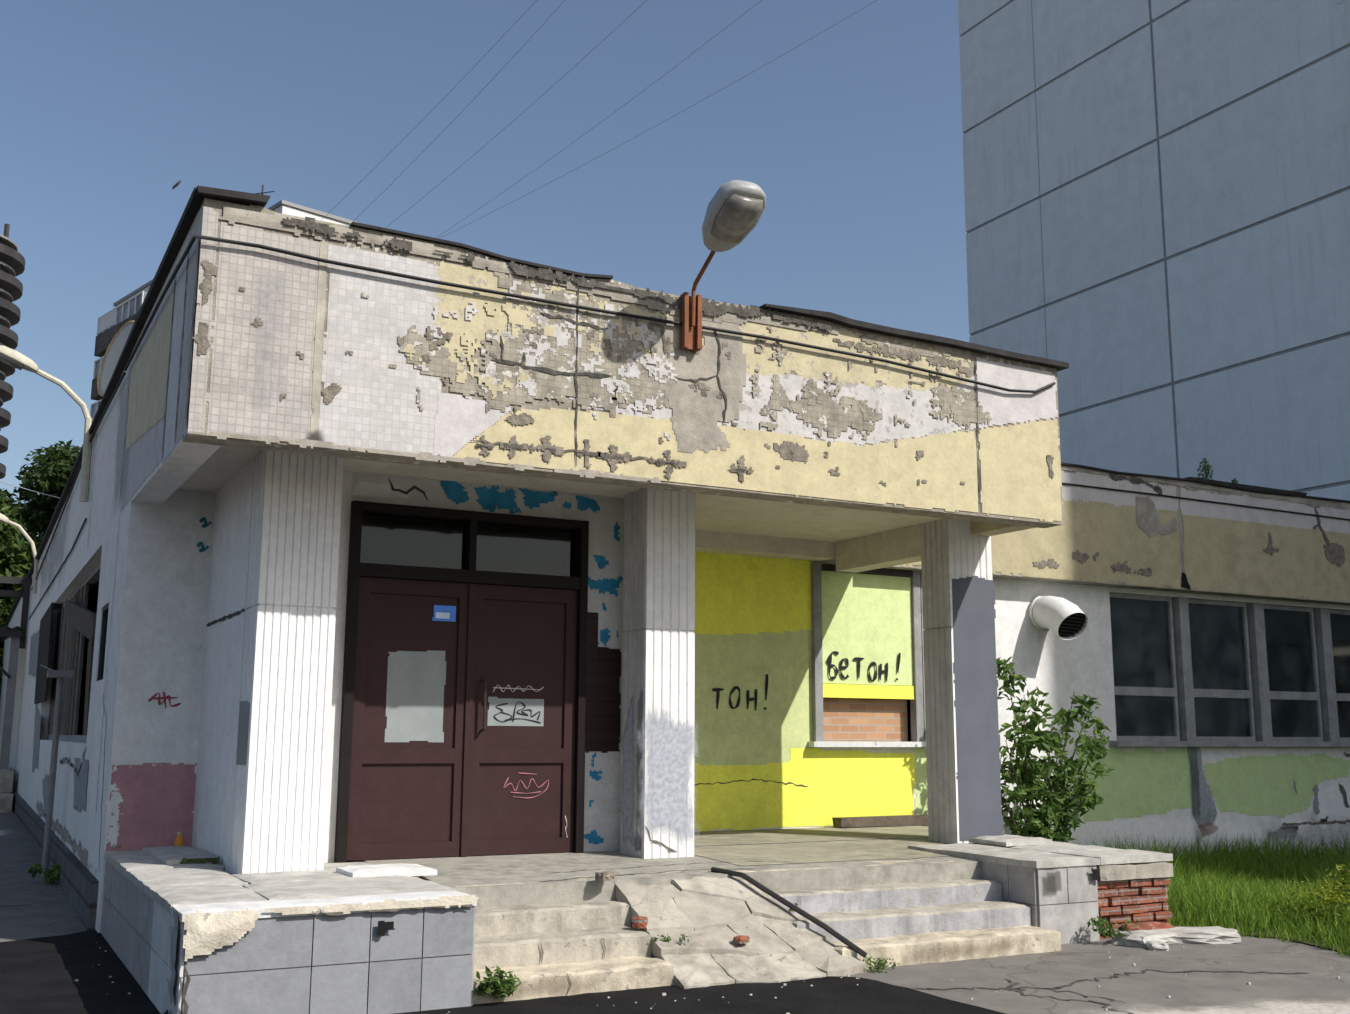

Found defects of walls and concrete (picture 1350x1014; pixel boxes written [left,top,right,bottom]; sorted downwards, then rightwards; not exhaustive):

peeling [185,206,992,483]
crack [649,323,727,424]
peeling [1047,455,1350,538]
spalling [1323,543,1345,567]
peeling [104,763,123,848]
peeling [1294,780,1320,815]
spalling [159,908,258,1014]
crack [915,969,1304,1014]